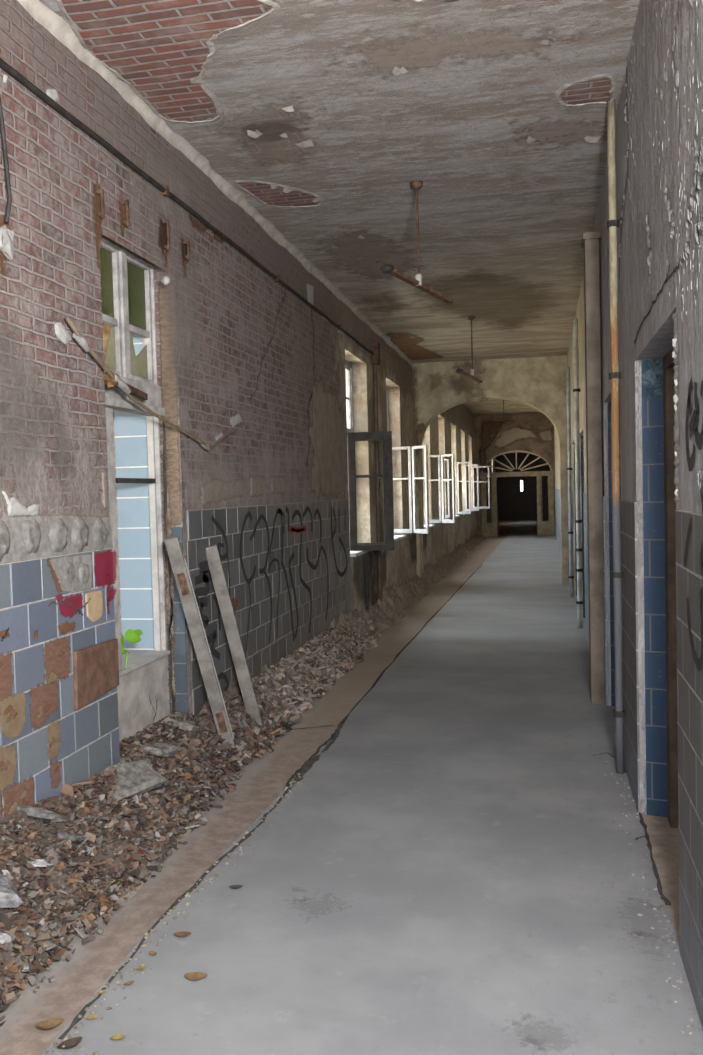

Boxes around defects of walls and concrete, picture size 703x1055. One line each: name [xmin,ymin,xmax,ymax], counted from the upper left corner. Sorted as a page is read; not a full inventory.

flaking render [46,88,59,102]
spalling [56,0,314,166]
spalling [235,180,324,208]
spalling [555,0,703,509]
peeling [386,332,443,360]
spalling [0,637,71,819]